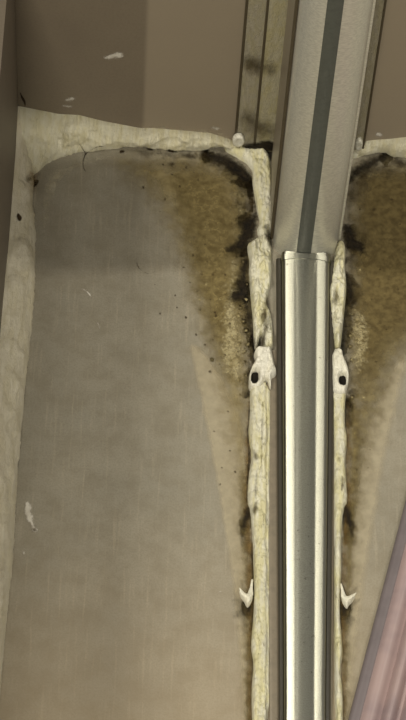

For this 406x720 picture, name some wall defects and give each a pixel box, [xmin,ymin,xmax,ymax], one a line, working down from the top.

water stain [140,153,257,413]
water stain [341,156,406,543]
peeling [25,502,38,532]
water stain [242,476,257,555]